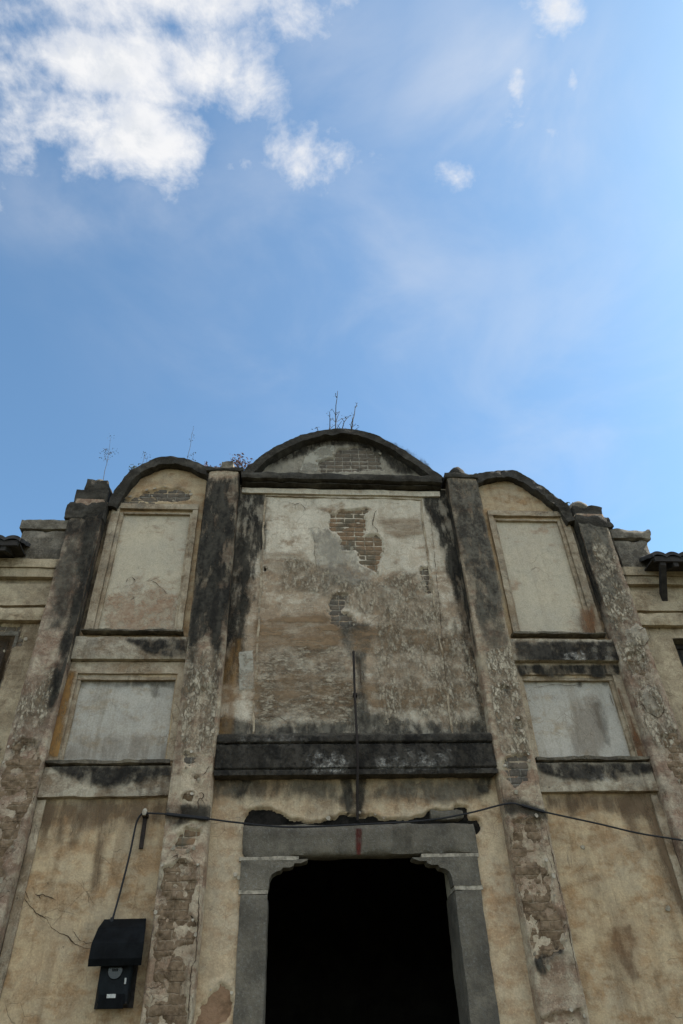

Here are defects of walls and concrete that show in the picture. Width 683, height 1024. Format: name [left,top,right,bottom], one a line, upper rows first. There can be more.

spalling [316,448,383,473]
spalling [123,486,193,504]
spalling [329,508,384,574]
water stain [127,473,267,696]
spalling [328,591,356,627]
water stain [214,478,626,814]
spalling [244,807,480,834]
crack [24,891,92,949]
spalling [145,830,233,1024]
spalling [510,813,568,971]